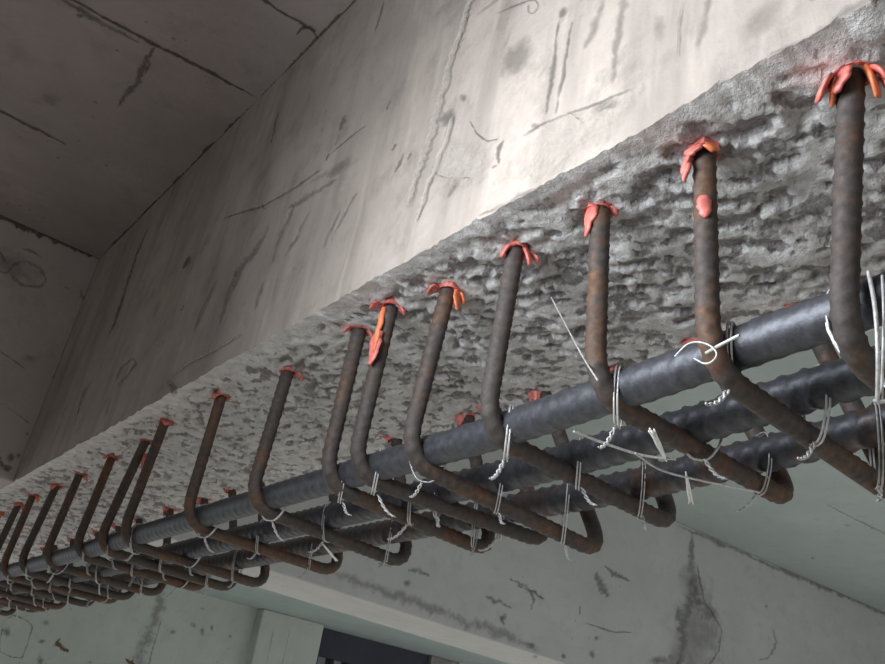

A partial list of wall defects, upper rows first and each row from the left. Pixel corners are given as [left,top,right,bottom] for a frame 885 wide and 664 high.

crack [120,48,154,104]
peeling [814,64,885,107]
crack [0,111,65,144]
spalling [723,292,833,371]
spalling [860,271,885,332]
spalling [421,419,611,517]
spalling [543,424,729,500]
spalling [610,343,714,407]
spalling [660,395,820,474]
spalling [757,358,885,453]
spalling [262,469,435,546]
spalling [0,492,349,608]